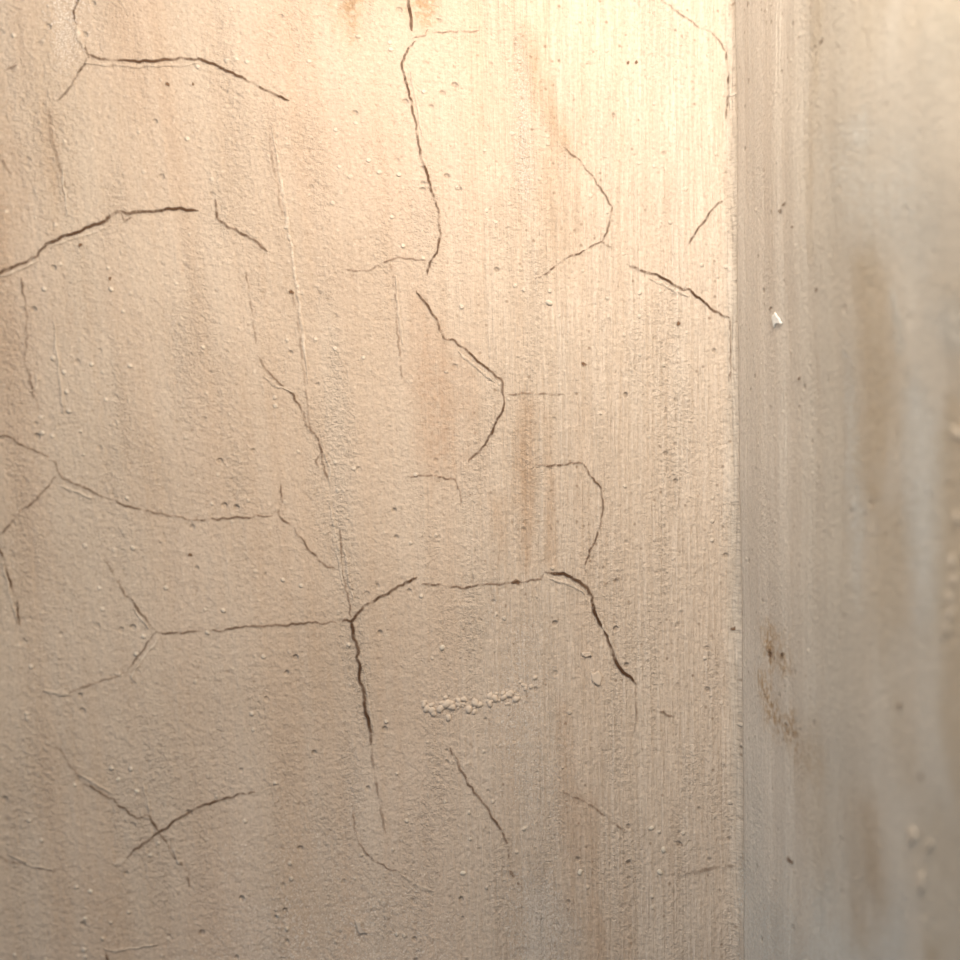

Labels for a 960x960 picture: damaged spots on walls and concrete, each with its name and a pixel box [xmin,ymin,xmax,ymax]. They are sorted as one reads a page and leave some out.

crack [73,0,290,101]
crack [0,168,267,277]
crack [401,0,505,459]
crack [575,185,611,255]
crack [689,201,722,242]
crack [634,267,731,376]
crack [263,376,300,406]
crack [61,484,138,509]
crack [122,589,318,683]
crack [201,462,636,743]
crack [81,775,252,881]
crack [450,749,504,836]